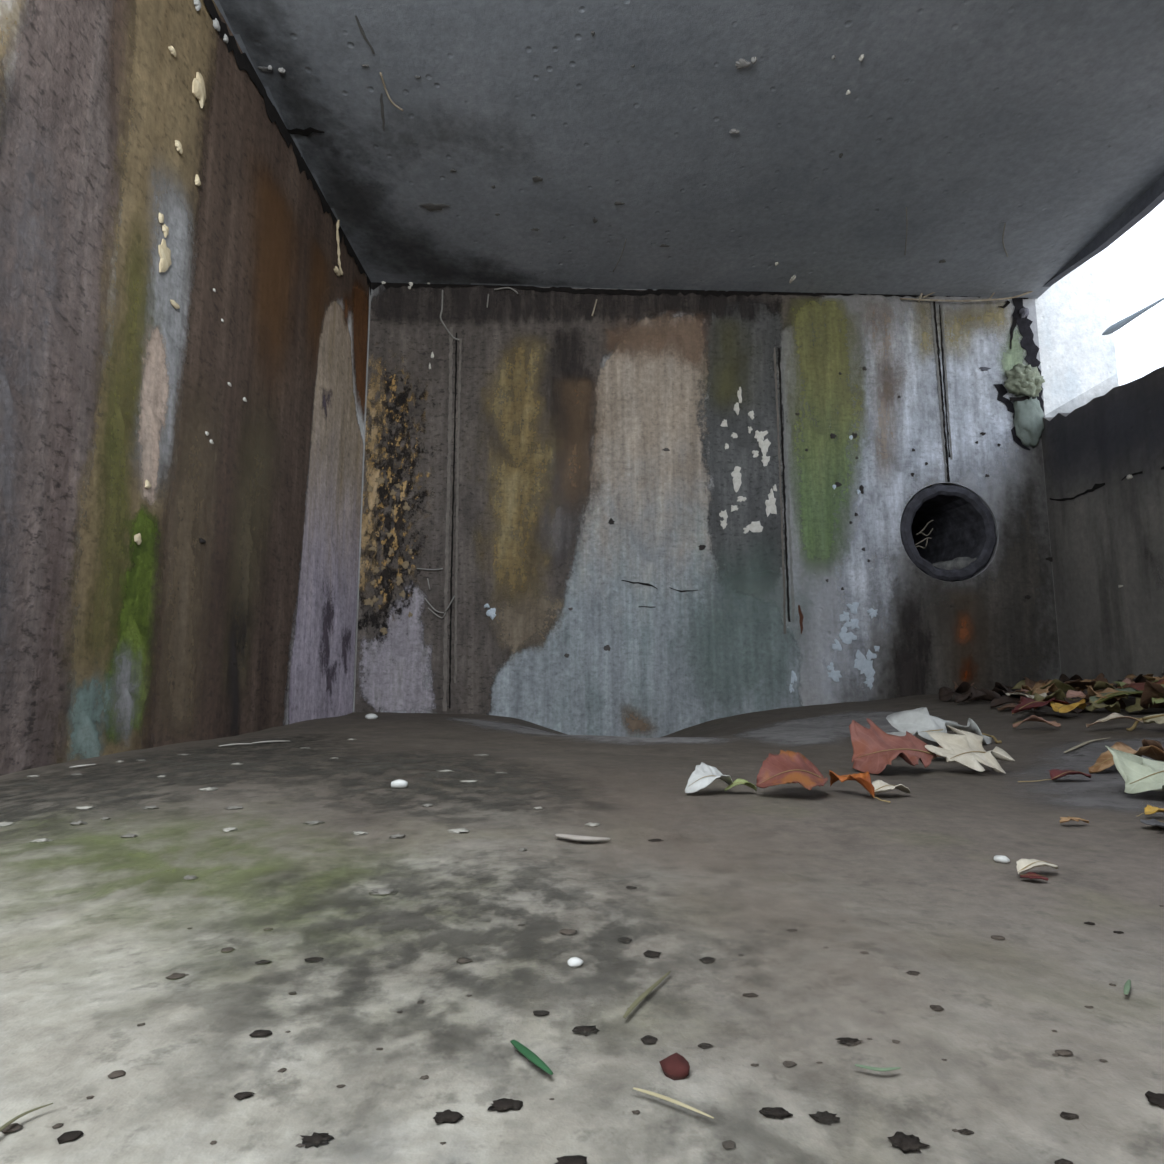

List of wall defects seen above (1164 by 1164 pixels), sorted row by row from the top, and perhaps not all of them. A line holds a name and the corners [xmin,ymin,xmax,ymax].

water stain [142,11,824,749]
crack [203,0,1044,413]
peeling [489,313,802,738]
peeling [827,602,880,690]
water stain [739,310,1060,745]
crack [1050,466,1164,501]